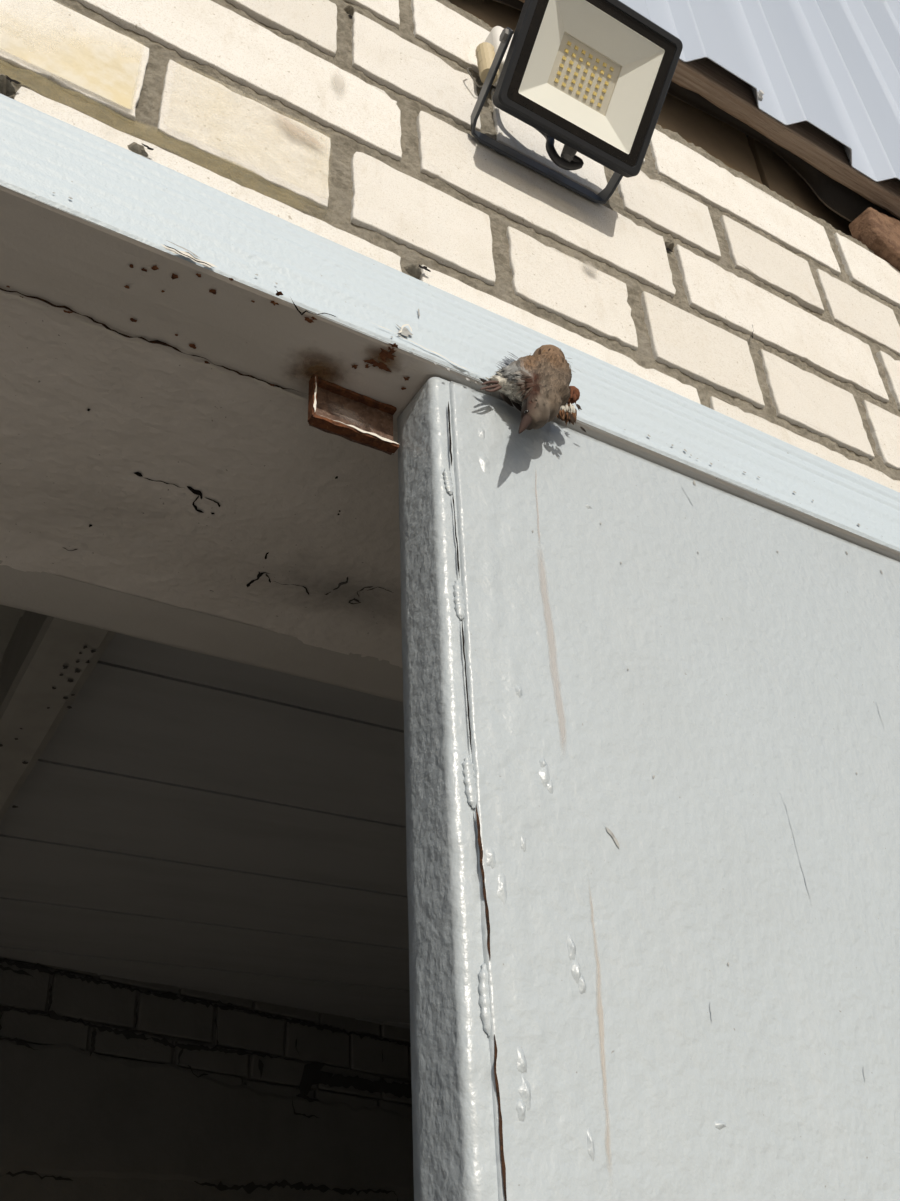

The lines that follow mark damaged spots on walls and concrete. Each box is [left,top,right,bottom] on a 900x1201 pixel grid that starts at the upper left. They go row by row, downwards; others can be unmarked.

crack [270,290,336,323]
crack [0,288,306,400]
corrosion [352,343,410,390]
crack [134,472,220,514]
crack [246,552,393,604]